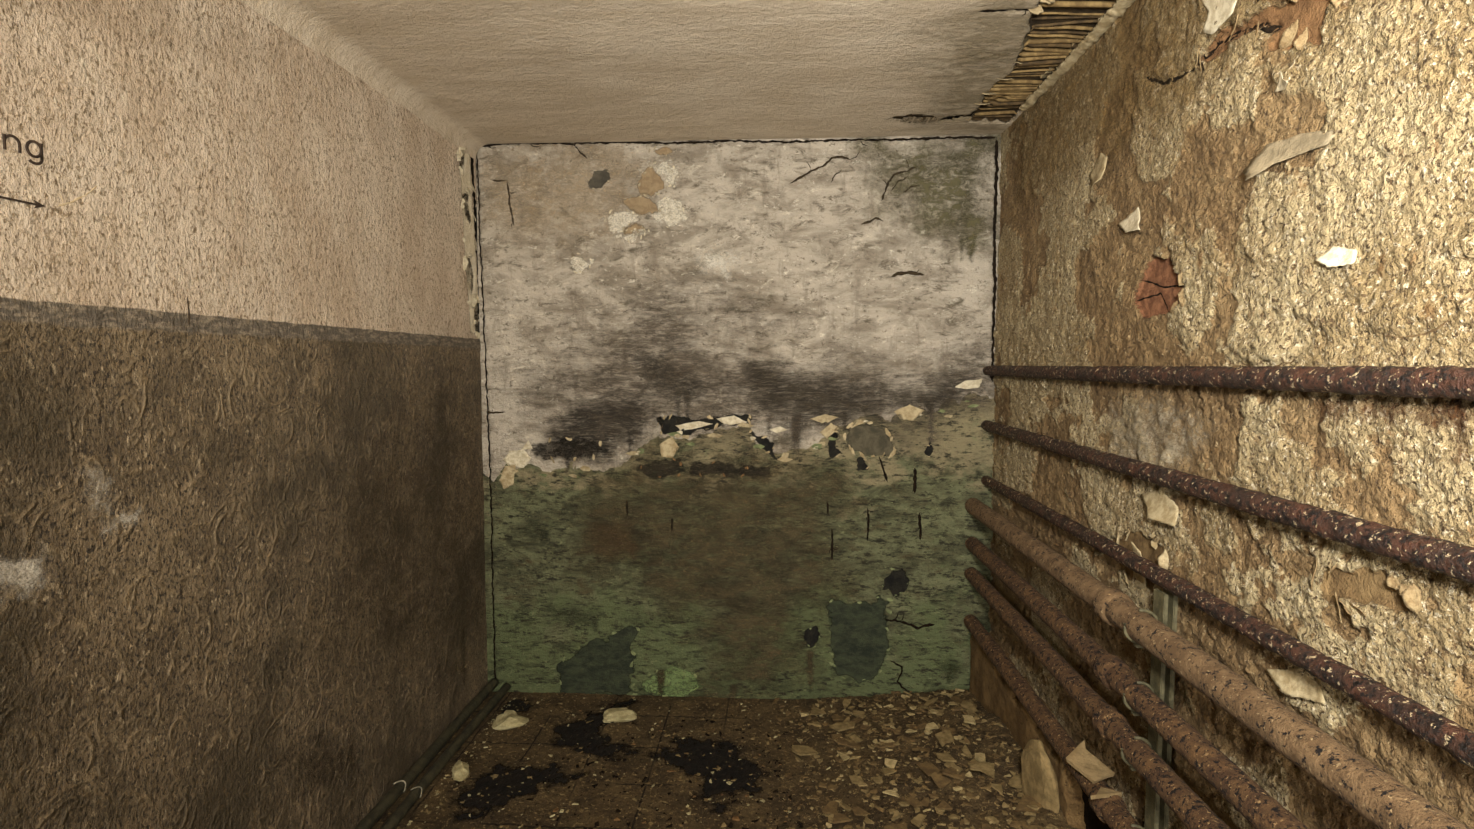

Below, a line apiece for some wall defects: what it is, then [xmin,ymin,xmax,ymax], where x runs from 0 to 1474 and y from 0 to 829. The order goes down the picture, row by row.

peeling [1019,0,1136,110]
crack [1146,0,1282,85]
spalling [1195,0,1343,72]
peeling [1274,71,1288,92]
leakage [519,296,991,698]
spalling [1112,490,1179,593]
spalling [1311,557,1422,624]
peeling [1265,668,1325,704]
spalling [1080,786,1111,829]